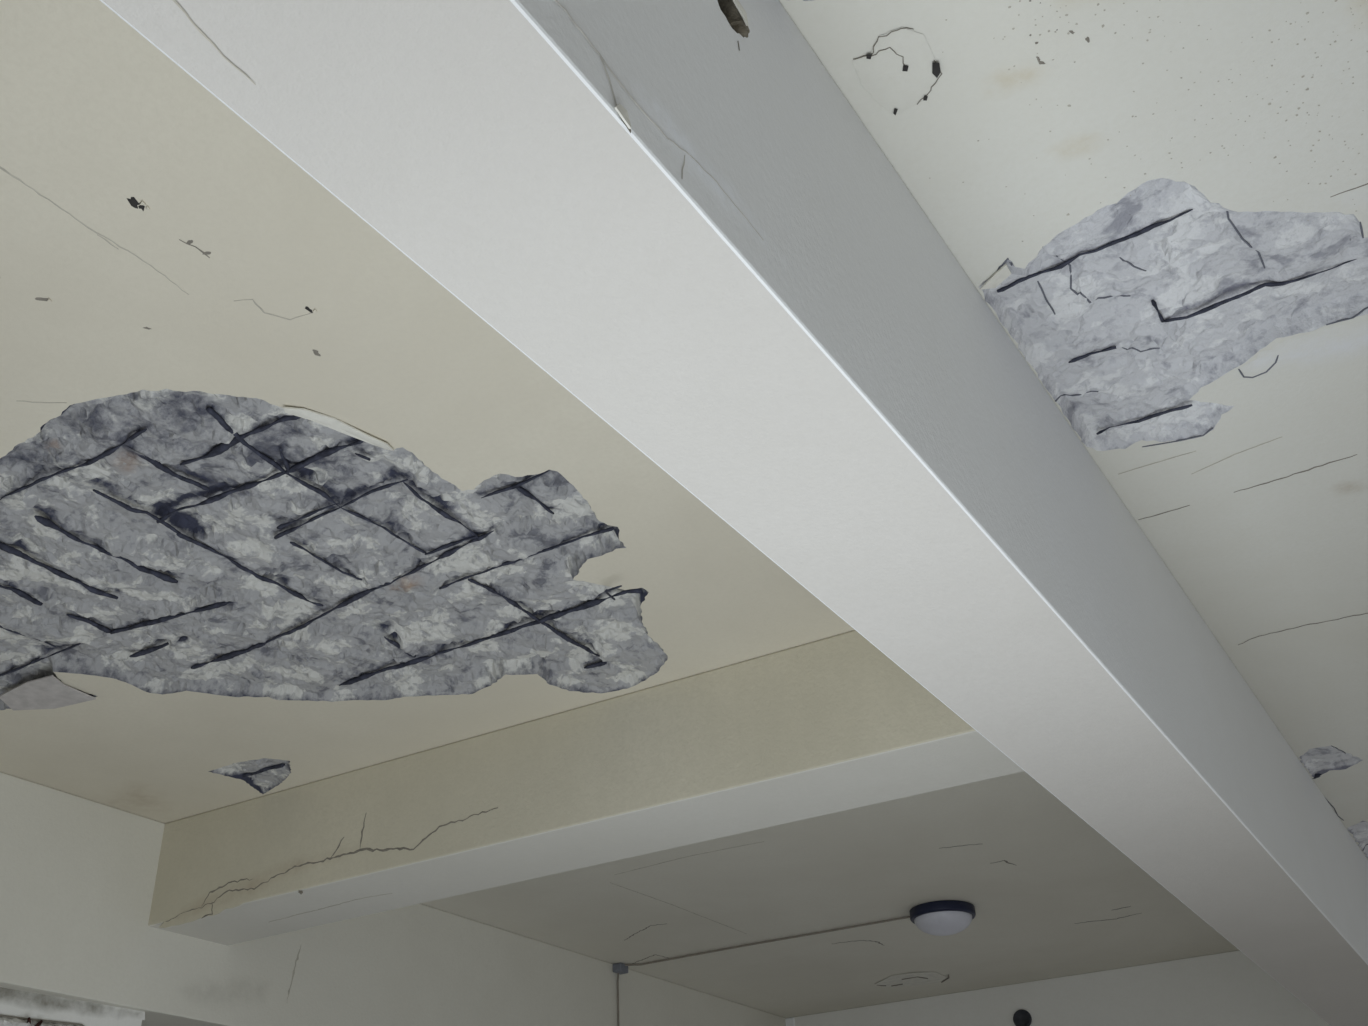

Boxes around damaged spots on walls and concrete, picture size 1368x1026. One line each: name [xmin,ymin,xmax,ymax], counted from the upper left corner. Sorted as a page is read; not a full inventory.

spalling [717,0,750,38]
spalling [979,0,1368,451]
spalling [0,389,668,710]
spalling [208,758,291,794]
spalling [1299,745,1362,779]
crack [165,807,498,922]
crack [270,893,392,999]